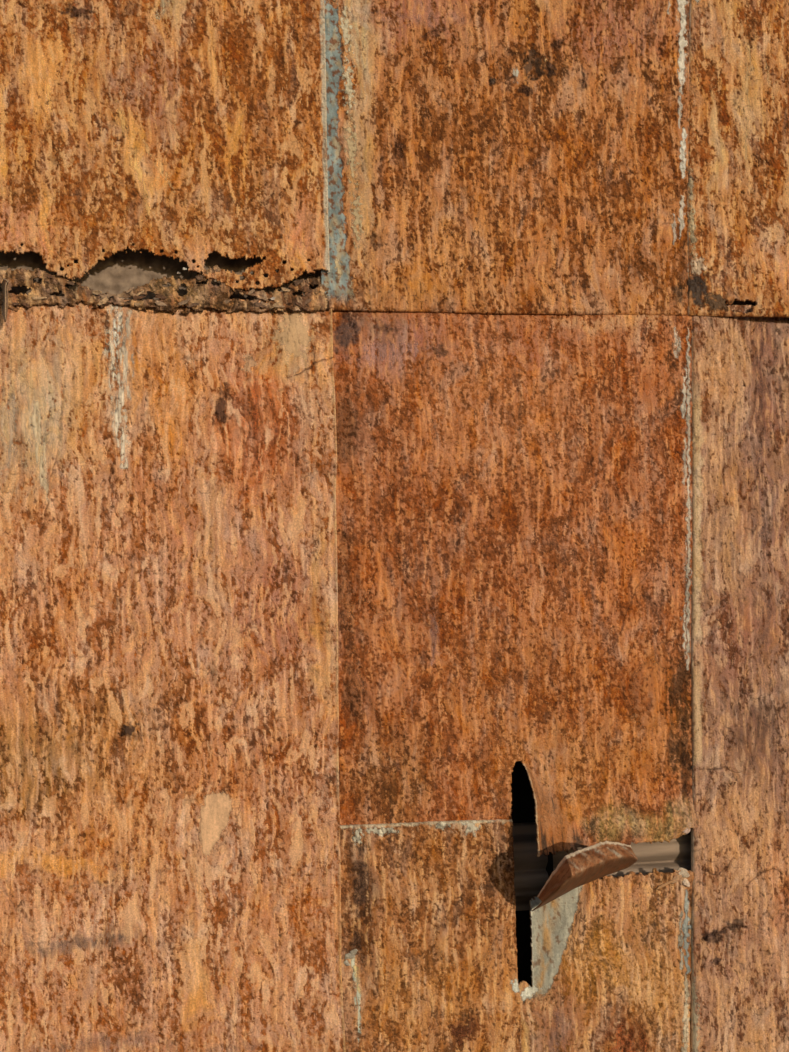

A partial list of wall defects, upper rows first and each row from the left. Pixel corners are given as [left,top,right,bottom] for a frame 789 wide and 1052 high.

rust [61,3,92,19]
rust [513,39,564,96]
peeling [92,287,199,308]
rust [672,272,741,312]
rust [335,314,360,352]
damp [104,305,133,469]
rust [215,382,231,423]
rust [121,722,136,736]
rust [350,844,369,950]
peeling [511,886,582,1001]
rust [704,919,747,943]
rust [450,1024,472,1046]